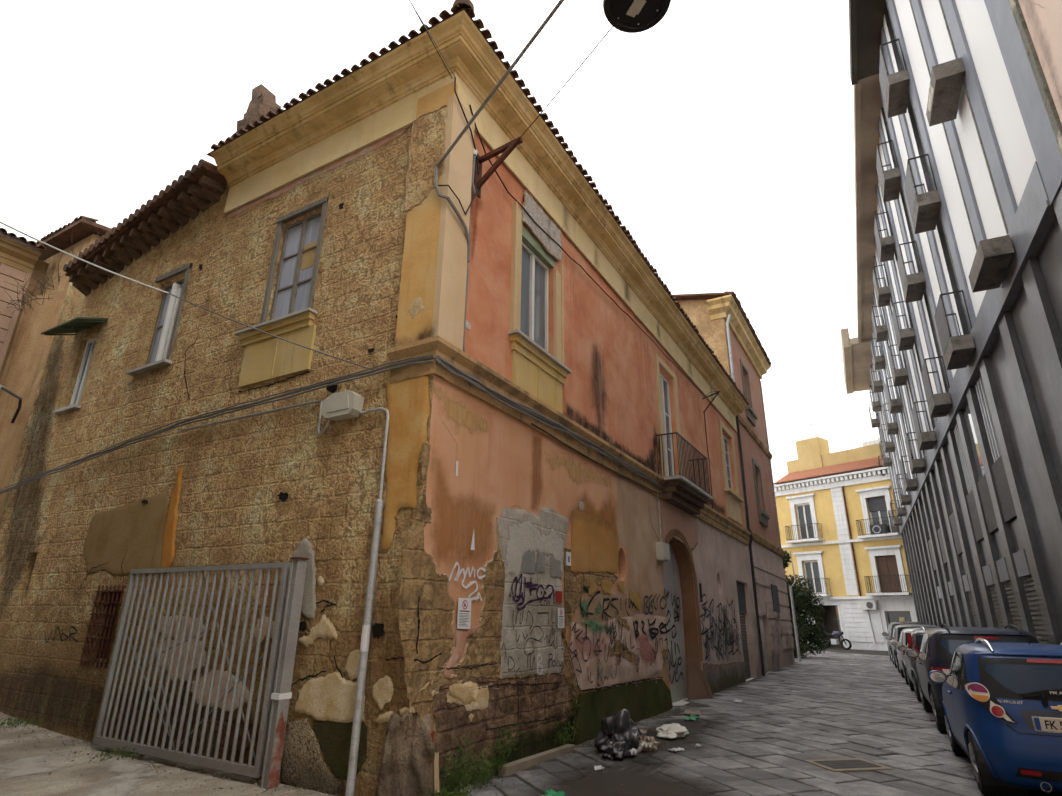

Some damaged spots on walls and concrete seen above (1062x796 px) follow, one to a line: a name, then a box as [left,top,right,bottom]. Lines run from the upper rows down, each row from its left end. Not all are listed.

water stain [593,348,604,414]
water stain [567,407,662,475]
flaking render [281,443,642,796]
water stain [110,697,256,759]
rust [268,710,287,789]